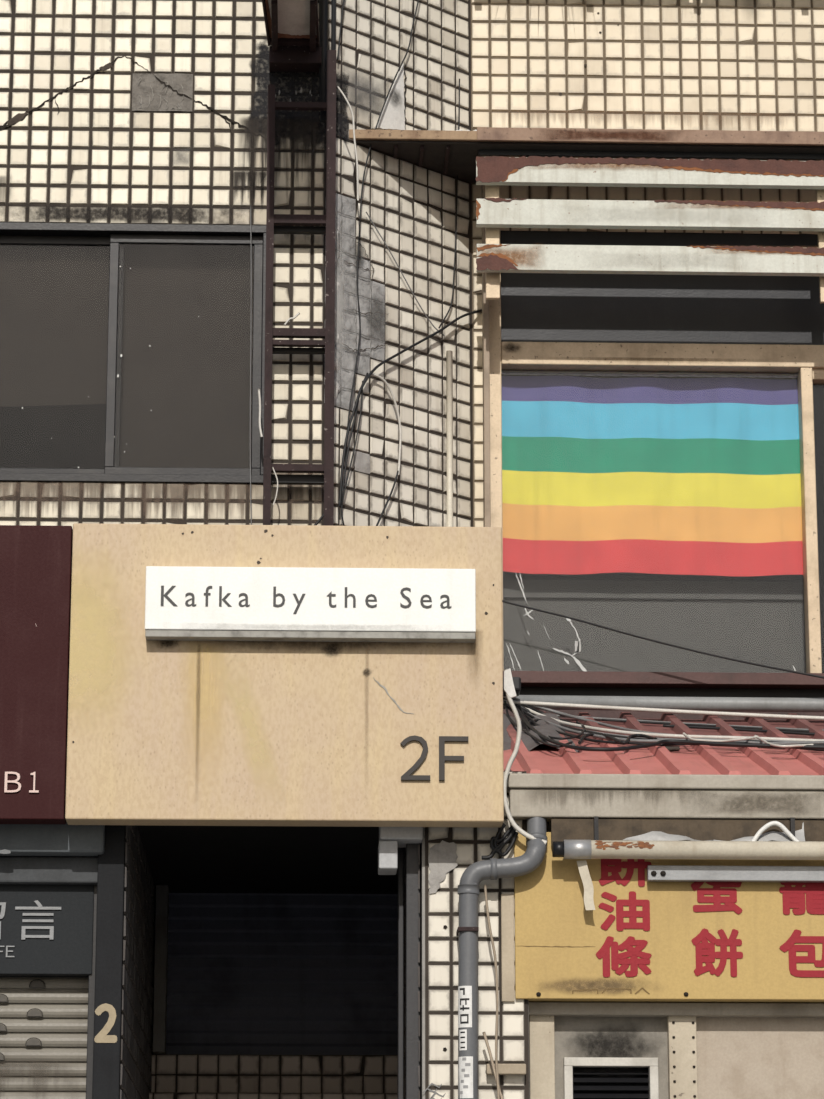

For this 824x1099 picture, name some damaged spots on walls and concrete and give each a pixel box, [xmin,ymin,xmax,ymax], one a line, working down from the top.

crack [0,55,151,130]
peeling [132,73,193,111]
crack [194,100,261,136]
corrosion [552,130,665,140]
leakage [234,118,319,202]
corrosion [475,156,824,183]
corrosion [654,200,824,211]
corrosion [476,244,532,271]
corrosion [687,245,824,256]
peeling [324,193,388,411]
leakage [0,483,106,508]
leakage [132,484,250,515]